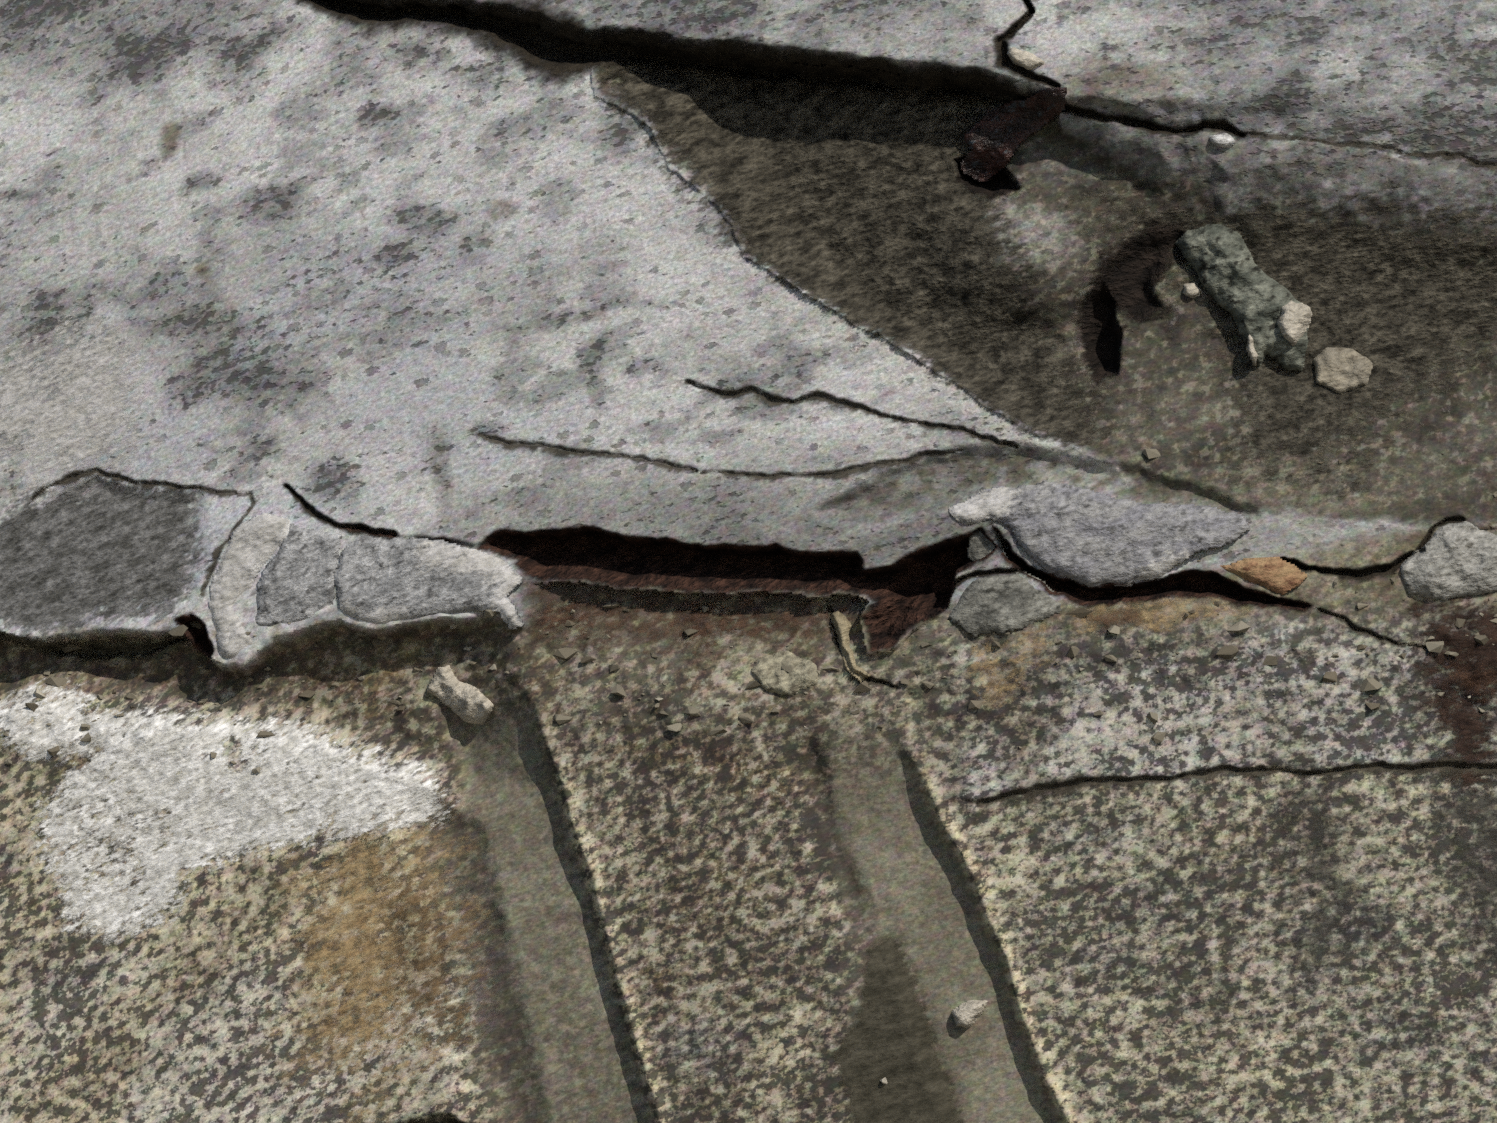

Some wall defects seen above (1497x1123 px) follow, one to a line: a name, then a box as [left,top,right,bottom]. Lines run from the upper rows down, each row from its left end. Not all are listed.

crack [297,0,1497,170]
crack [477,379,1018,480]
spalling [0,471,525,659]
peeling [948,480,1307,595]
water stain [0,680,454,941]
crack [978,756,1497,806]